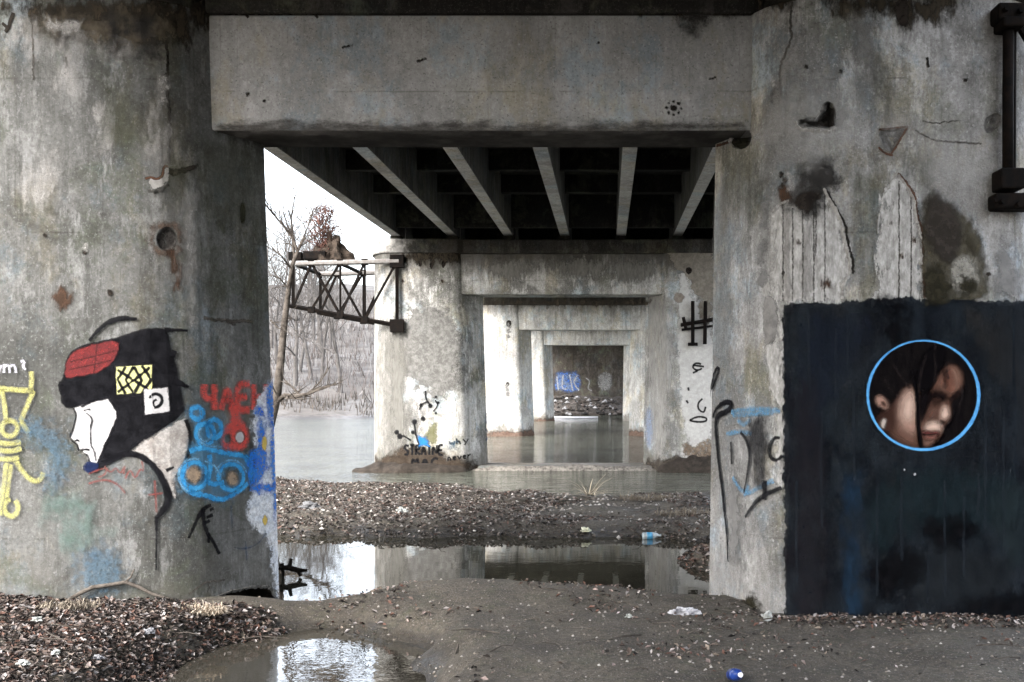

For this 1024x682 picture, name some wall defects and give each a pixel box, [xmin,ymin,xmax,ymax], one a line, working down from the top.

crack [777,1,795,129]
spalling [794,101,849,144]
spalling [145,164,198,195]
peeling [871,172,927,301]
corrosion [51,285,74,311]